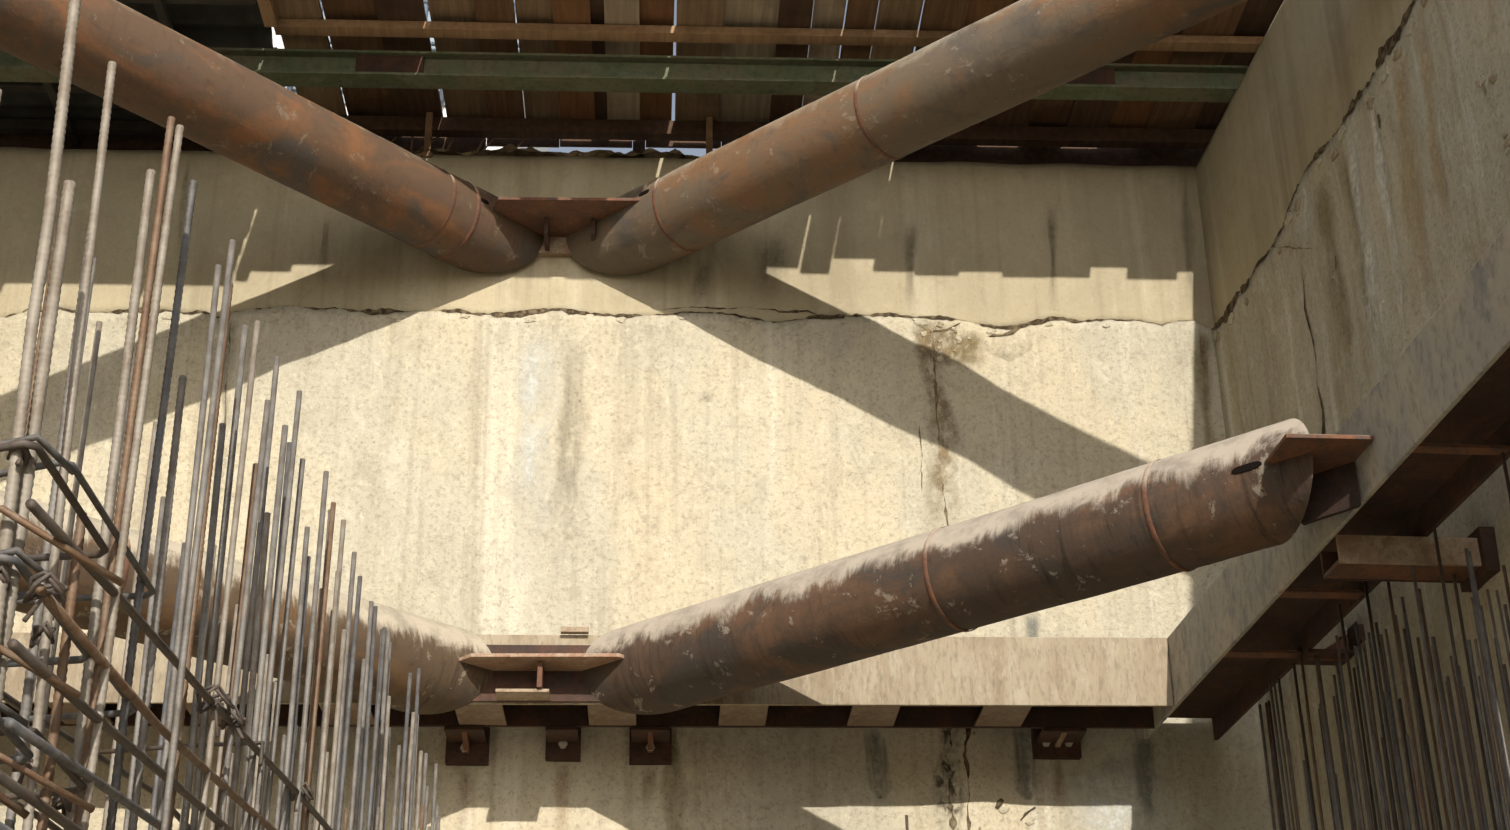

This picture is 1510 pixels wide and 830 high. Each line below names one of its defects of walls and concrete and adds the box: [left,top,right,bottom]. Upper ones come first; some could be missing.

crack [5,0,1428,526]
leakage [936,728,958,830]
crack [956,728,1036,830]